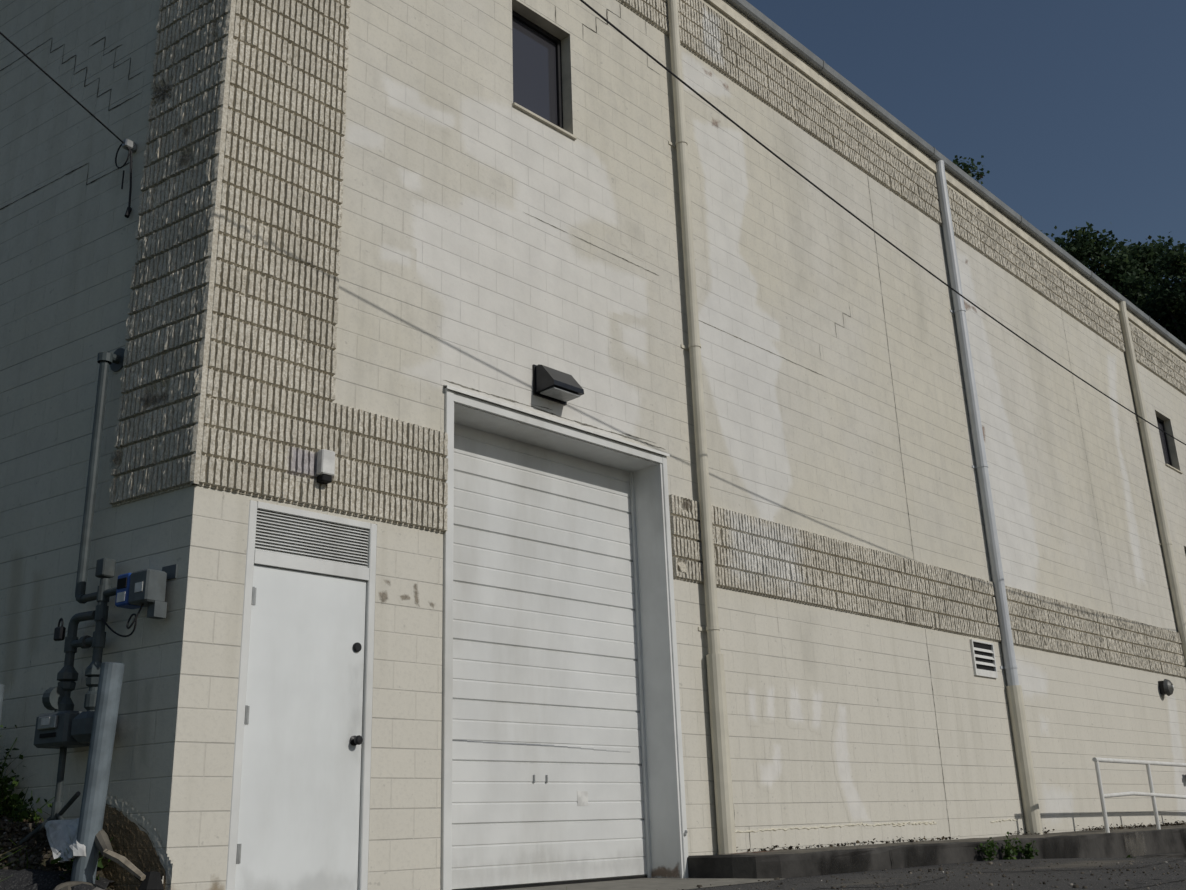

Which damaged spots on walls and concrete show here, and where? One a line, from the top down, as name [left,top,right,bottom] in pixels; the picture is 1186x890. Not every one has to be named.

crack [555,6,621,33]
crack [0,36,145,111]
crack [0,161,133,210]
leakage [712,506,875,828]